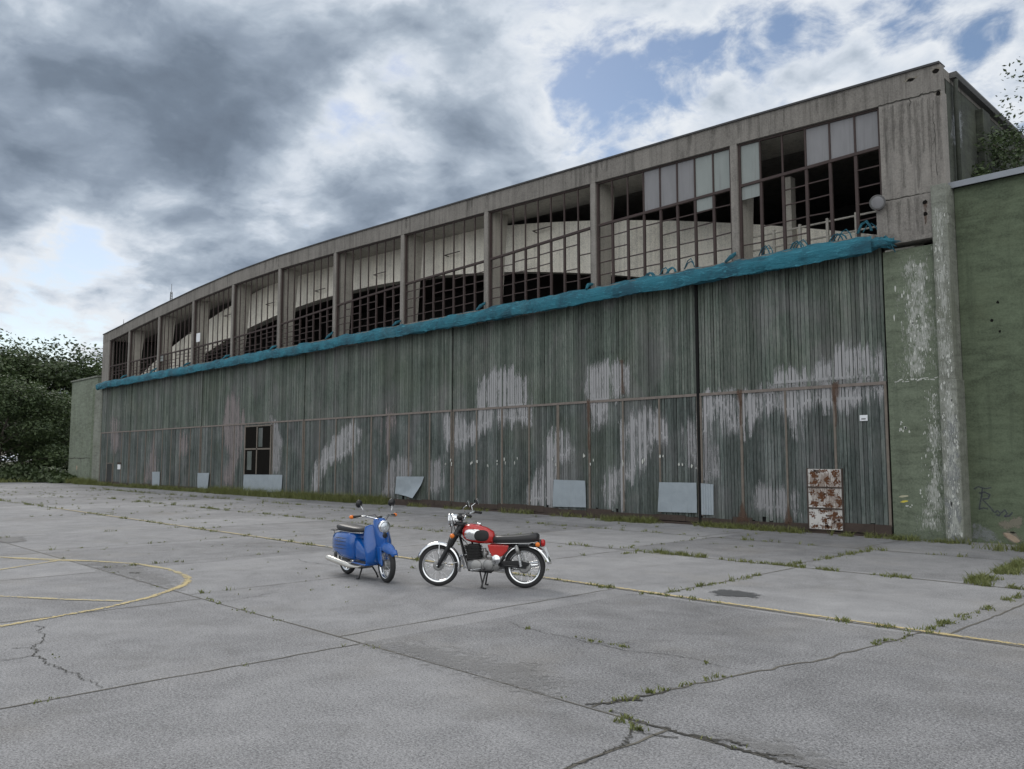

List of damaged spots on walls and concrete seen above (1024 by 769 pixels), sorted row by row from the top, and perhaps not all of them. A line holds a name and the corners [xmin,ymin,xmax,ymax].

peeling [678,204,963,541]
peeling [312,420,362,493]
peeling [430,364,532,495]
peeling [584,359,668,511]
rust [808,469,843,530]
crack [5,626,103,688]
crack [565,688,817,769]